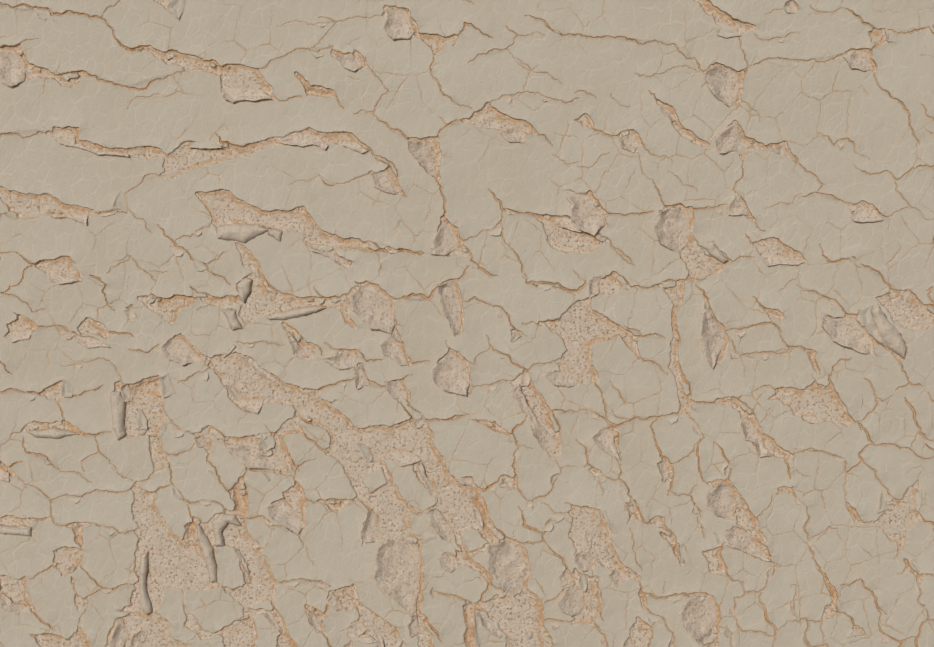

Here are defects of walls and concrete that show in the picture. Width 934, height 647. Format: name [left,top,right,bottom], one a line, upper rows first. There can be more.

peeling [0,44,86,89]
crack [0,0,199,111]
peeling [125,44,346,110]
crack [353,13,693,142]
peeling [48,125,408,198]
crack [458,188,588,293]
peeling [521,0,934,585]
peeling [0,136,644,647]
crack [0,398,235,536]
crack [406,404,574,546]
crack [716,349,934,647]
peeling [623,617,657,647]